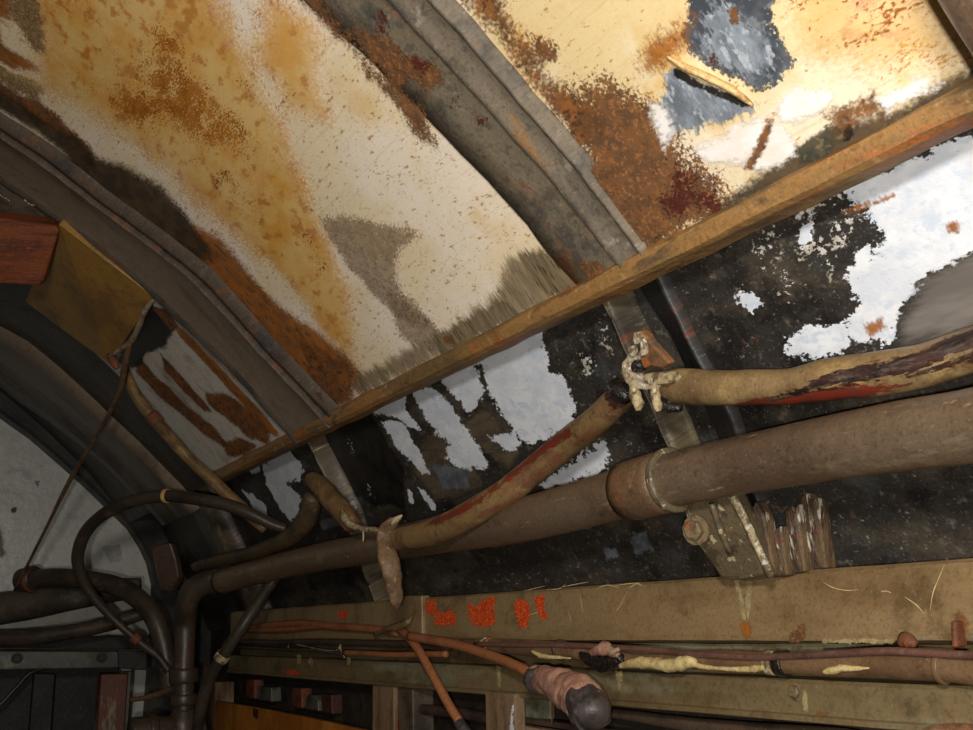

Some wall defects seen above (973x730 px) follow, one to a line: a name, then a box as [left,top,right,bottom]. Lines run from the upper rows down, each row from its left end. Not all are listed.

corrosion [461,0,739,247]
peeling [648,0,834,170]
peeling [876,74,940,114]
corrosion [136,326,278,457]
corrosion [0,0,445,407]
water stain [320,213,517,355]
peeling [407,487,436,510]
peeling [373,332,577,491]
peeling [539,440,612,490]
peeling [576,353,597,375]
peeling [734,284,763,315]
peeling [747,135,973,361]